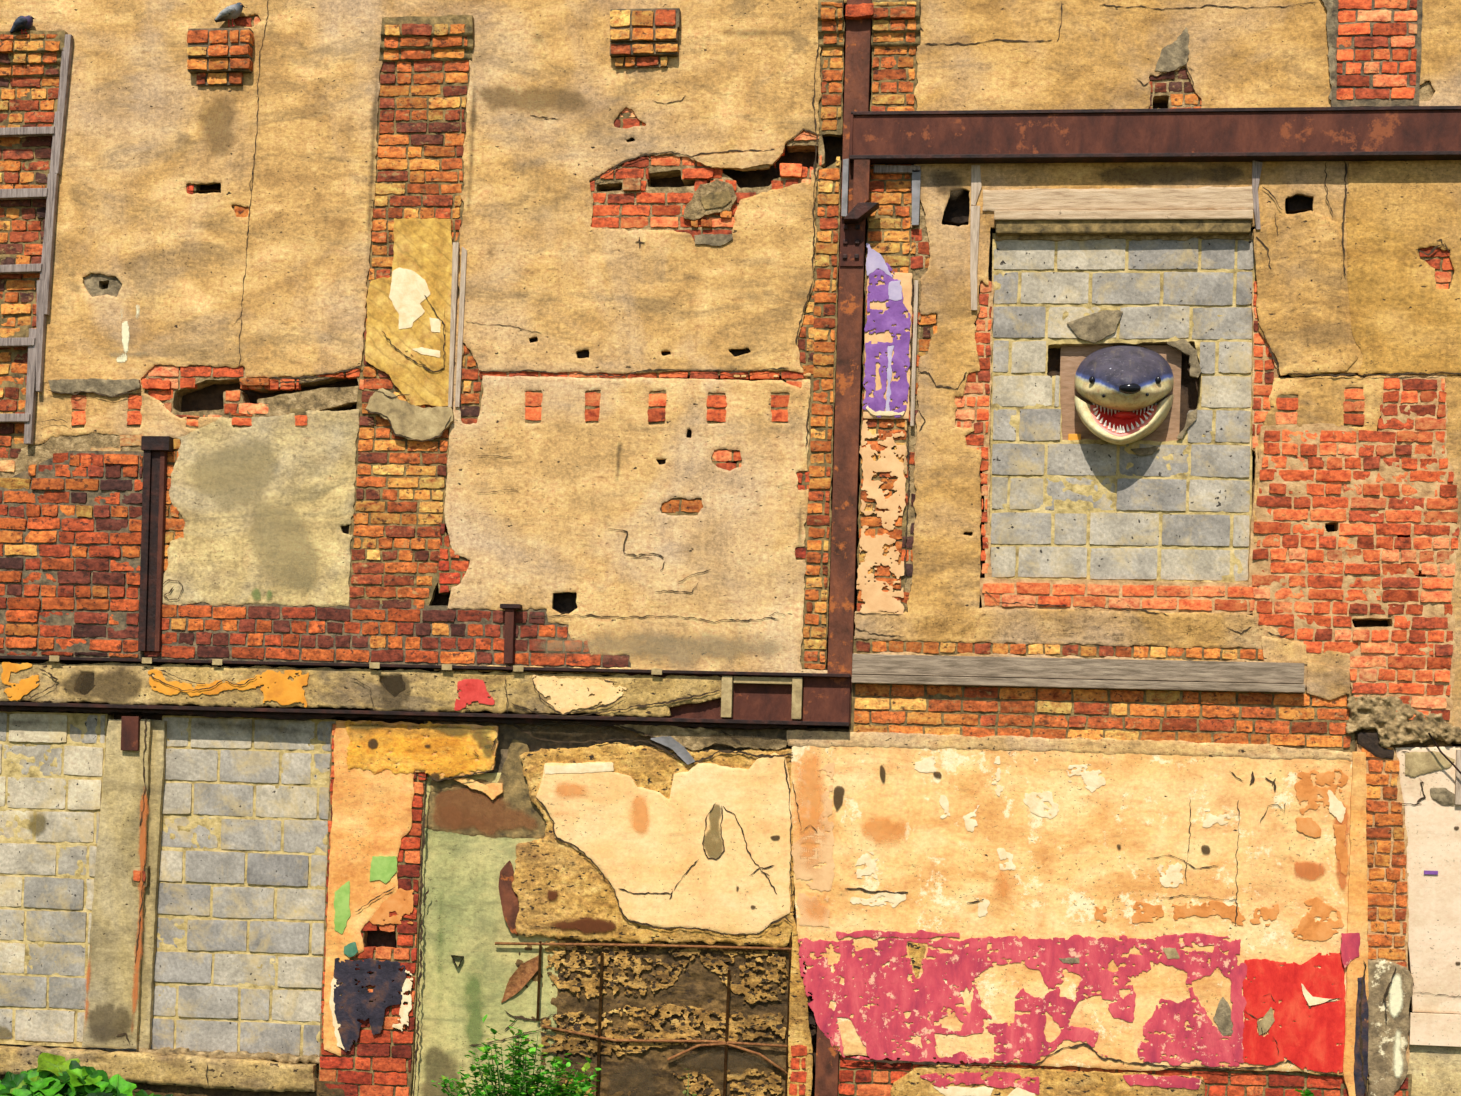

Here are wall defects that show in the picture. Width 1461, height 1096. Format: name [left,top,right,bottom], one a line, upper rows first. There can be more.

crack [235,1,819,442]
flaking render [590,130,826,242]
flaking render [0,365,364,573]
damp [195,444,315,598]
crack [527,529,784,623]
peeling [856,201,938,615]
flaking render [1248,281,1461,721]
peeling [148,669,309,707]
peeling [329,881,413,1052]
peeling [369,856,414,925]
crack [356,675,817,1096]
peeling [498,756,1413,1096]